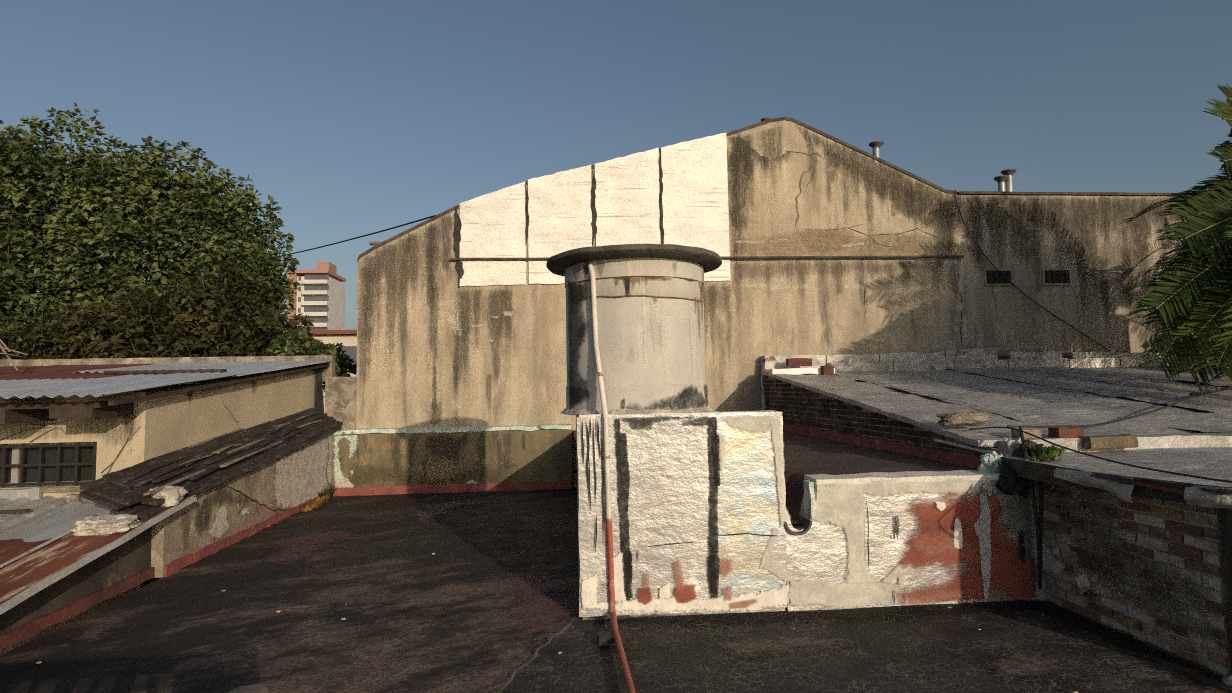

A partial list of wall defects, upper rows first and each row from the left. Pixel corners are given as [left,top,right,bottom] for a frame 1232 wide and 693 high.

crack [787,151,966,348]
water stain [805,130,1187,259]
water stain [378,279,394,381]
peeling [189,433,357,554]